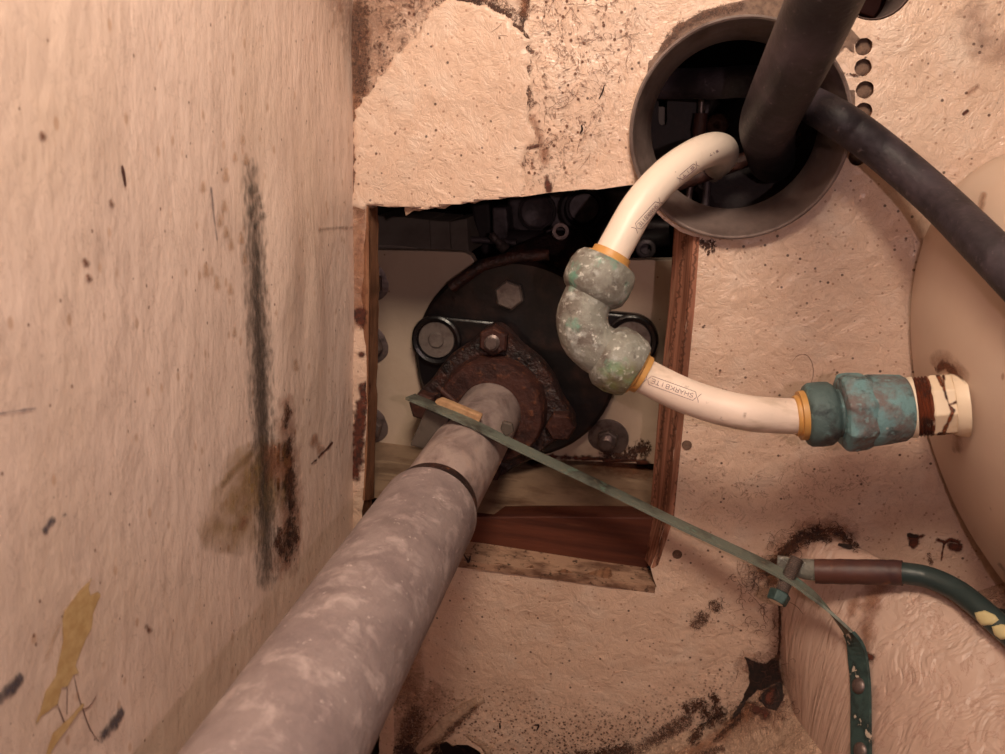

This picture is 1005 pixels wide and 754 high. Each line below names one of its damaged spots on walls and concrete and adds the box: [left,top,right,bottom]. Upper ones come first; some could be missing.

leakage [214,294,279,561]
leakage [393,707,426,754]
leakage [559,681,756,754]